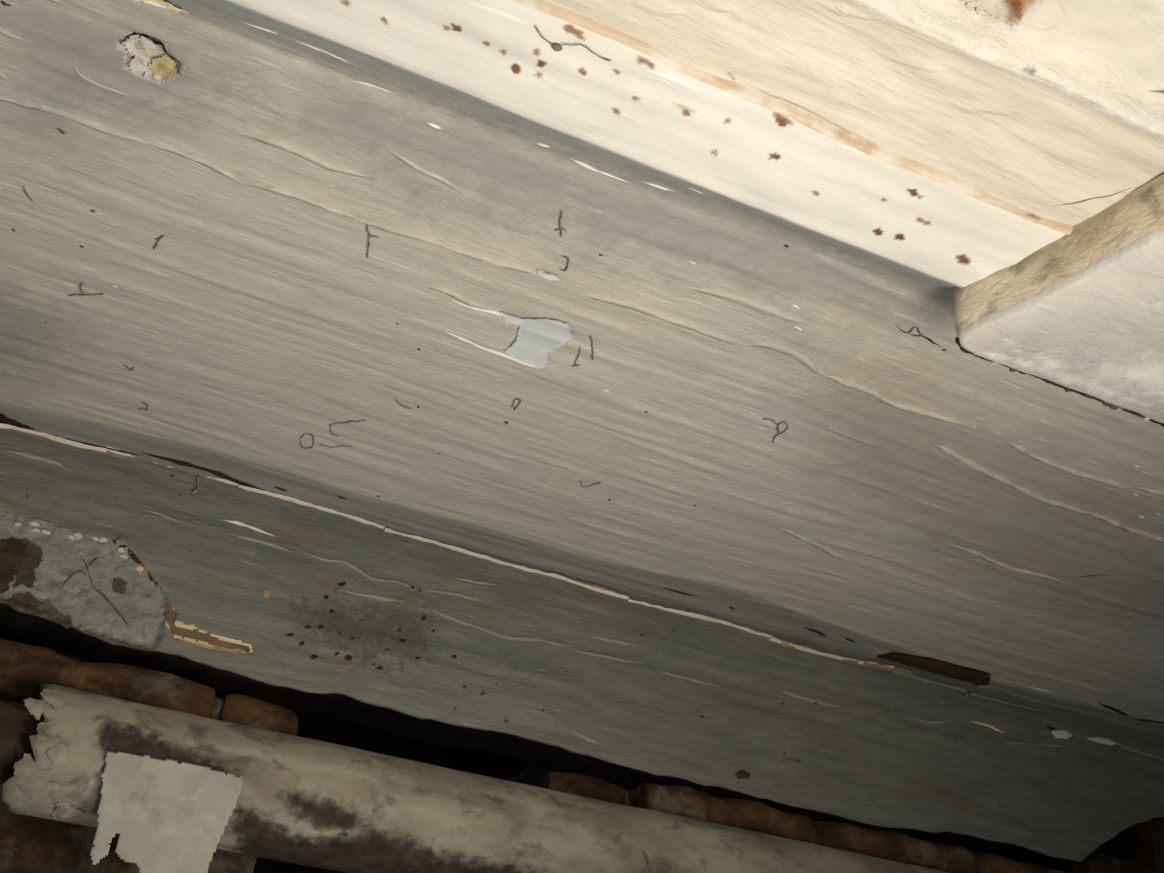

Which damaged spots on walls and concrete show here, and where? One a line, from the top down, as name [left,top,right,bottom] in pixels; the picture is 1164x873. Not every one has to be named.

peeling [136,0,189,14]
rust [1006,0,1036,21]
flaking render [122,32,179,84]
peeling [445,300,575,369]
crack [582,287,1164,544]
flaking render [0,510,254,653]
crack [0,414,1164,760]
peeling [24,688,68,742]
peeling [13,753,43,780]
peeling [52,801,86,822]